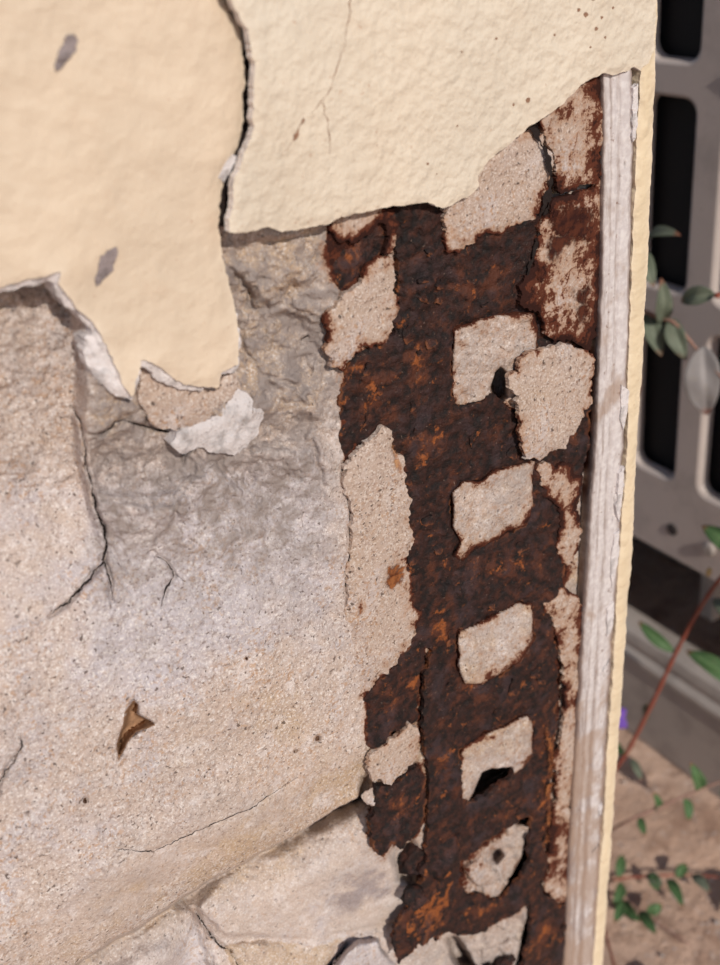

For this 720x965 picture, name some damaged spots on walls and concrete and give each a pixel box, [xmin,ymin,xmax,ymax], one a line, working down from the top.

crack [218,0,250,227]
peeling [0,0,657,656]
crack [52,409,169,614]
crack [157,556,186,605]
corrosion [331,196,593,965]
spalling [455,600,534,685]
spalling [553,657,564,749]
crack [0,737,23,782]
crack [119,777,298,852]
spalling [75,647,534,965]
crack [196,913,238,965]